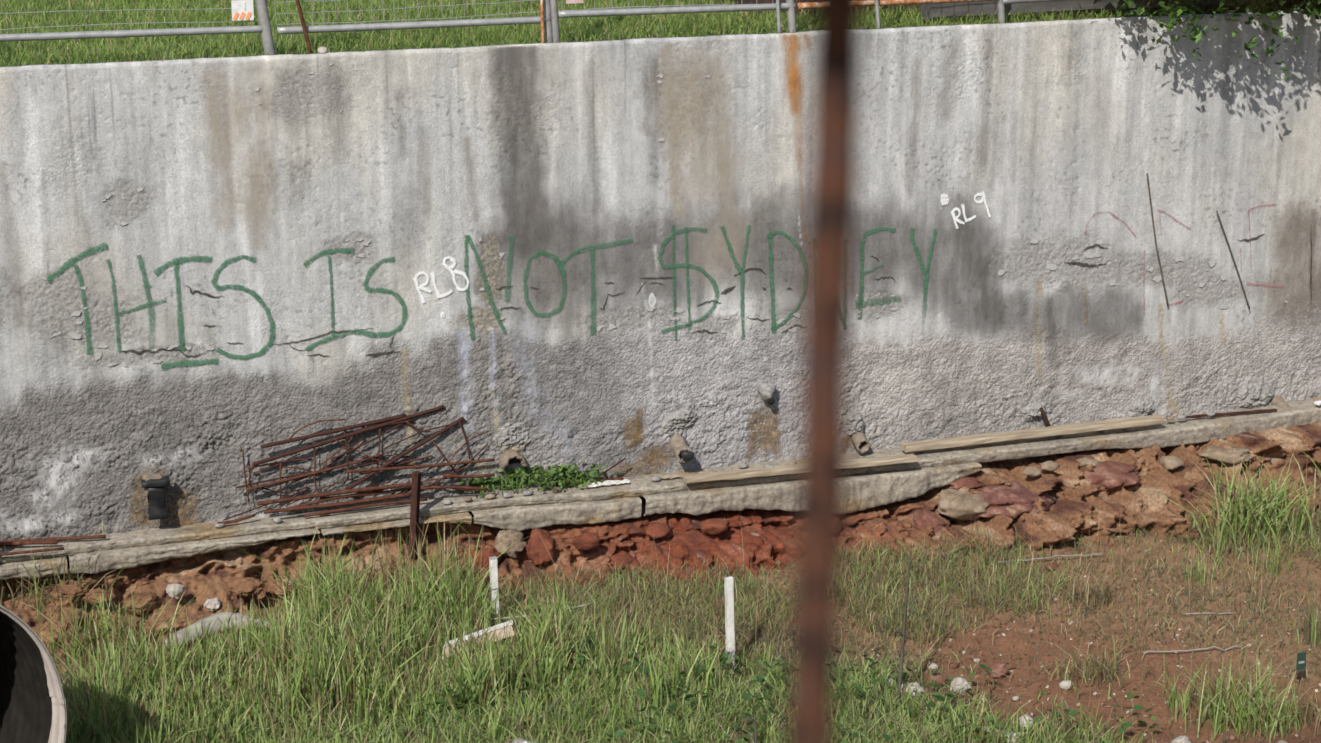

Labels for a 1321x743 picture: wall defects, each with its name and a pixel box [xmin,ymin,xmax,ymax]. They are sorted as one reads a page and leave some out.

corrosion [785,34,799,95]
water stain [497,45,696,302]
water stain [715,202,807,282]
water stain [852,219,971,298]